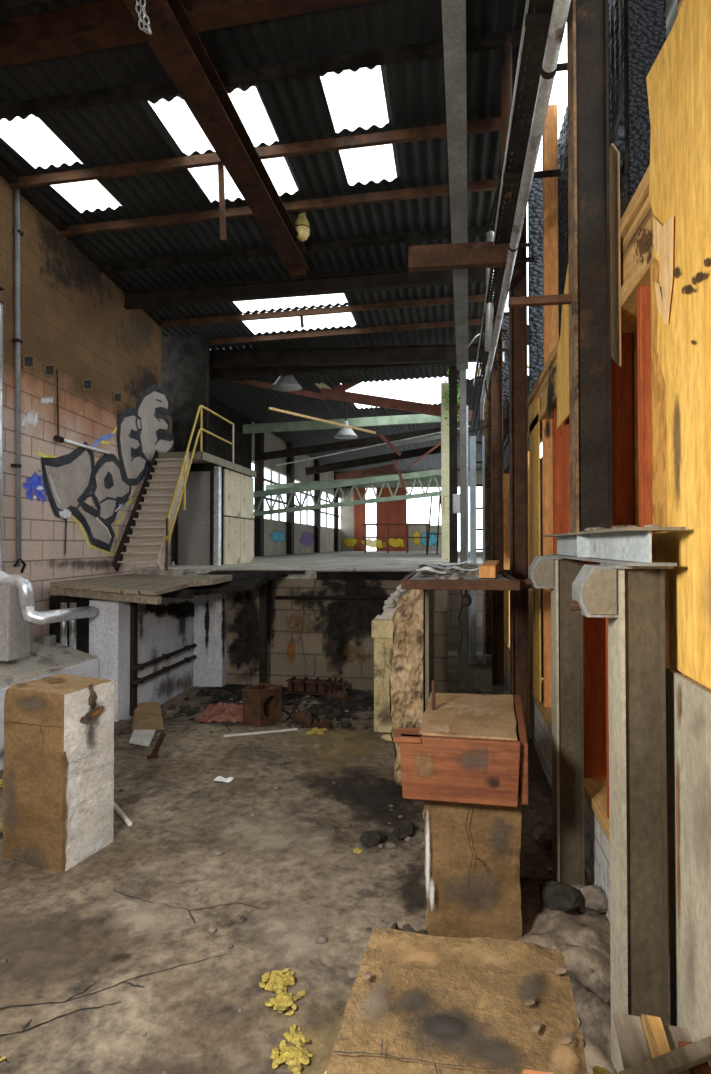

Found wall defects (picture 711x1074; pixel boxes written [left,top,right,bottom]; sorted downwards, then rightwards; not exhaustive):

leakage [153,656,192,694]
crack [114,890,266,924]
crack [0,954,226,1062]